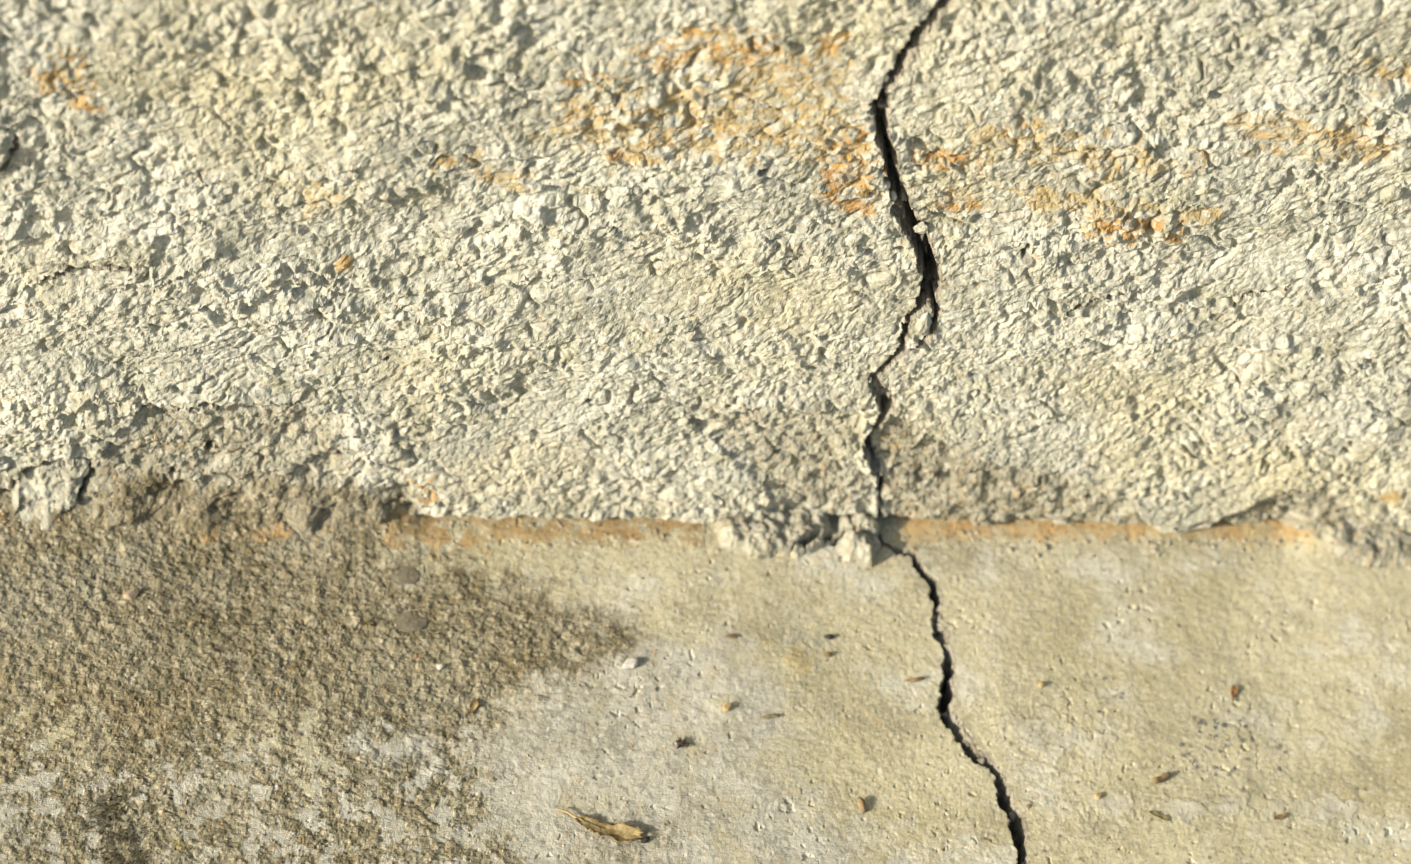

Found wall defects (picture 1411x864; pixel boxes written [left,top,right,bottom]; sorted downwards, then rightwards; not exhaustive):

water stain [0,488,967,864]
water stain [366,433,703,519]
crack [819,533,837,547]
crack [862,0,1032,864]